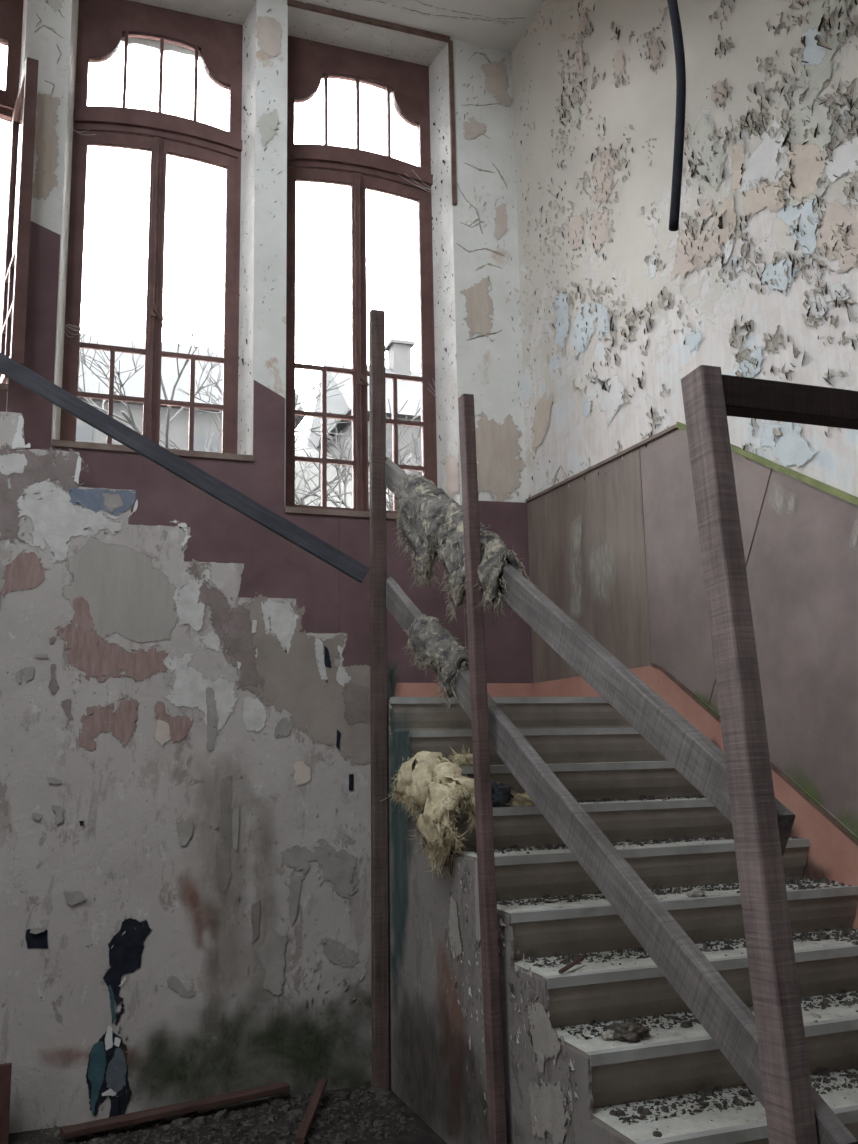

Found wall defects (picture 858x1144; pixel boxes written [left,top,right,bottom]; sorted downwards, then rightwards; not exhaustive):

peeling [243,8,283,189]
peeling [16,520,371,791]
spalling [86,918,151,1118]
mould [138,1000,372,1103]
peeling [498,917,579,1144]